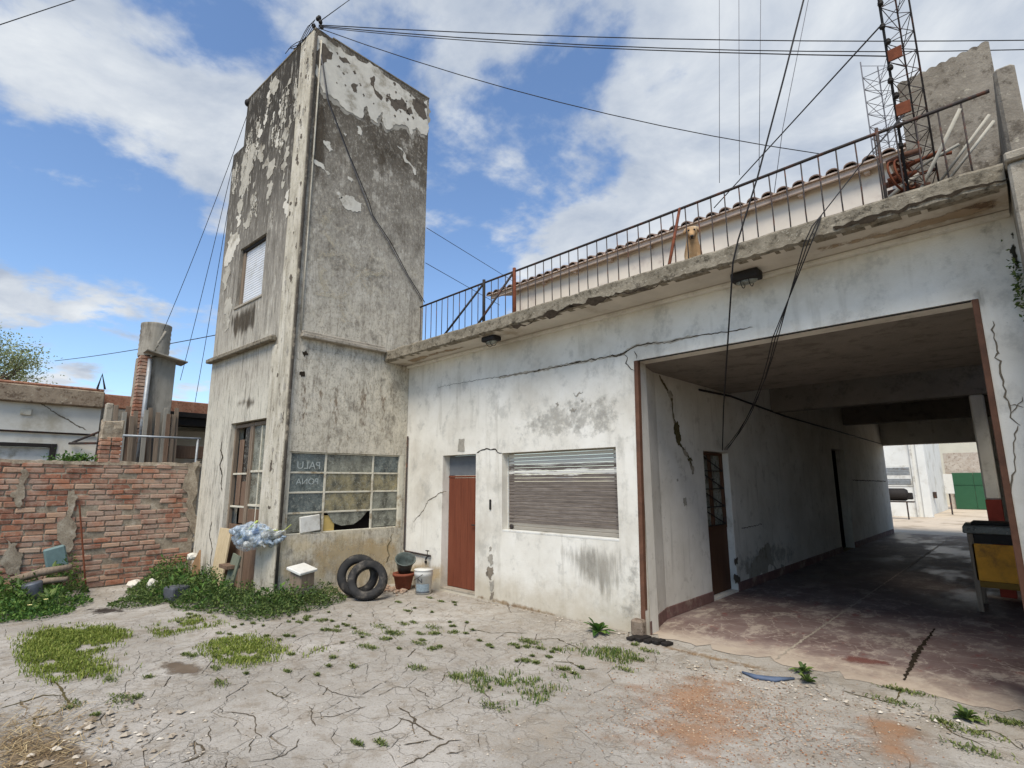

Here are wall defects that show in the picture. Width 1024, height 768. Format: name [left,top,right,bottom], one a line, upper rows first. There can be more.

peeling [222,36,431,332]
spalling [833,215,877,230]
spalling [511,282,662,329]
crack [438,327,750,388]
crack [659,375,694,475]
crack [991,322,1024,492]
peeling [57,490,78,552]
peeling [0,532,23,576]
peeling [486,547,494,600]
crack [842,628,935,704]
crack [2,681,70,726]
crack [181,682,494,767]